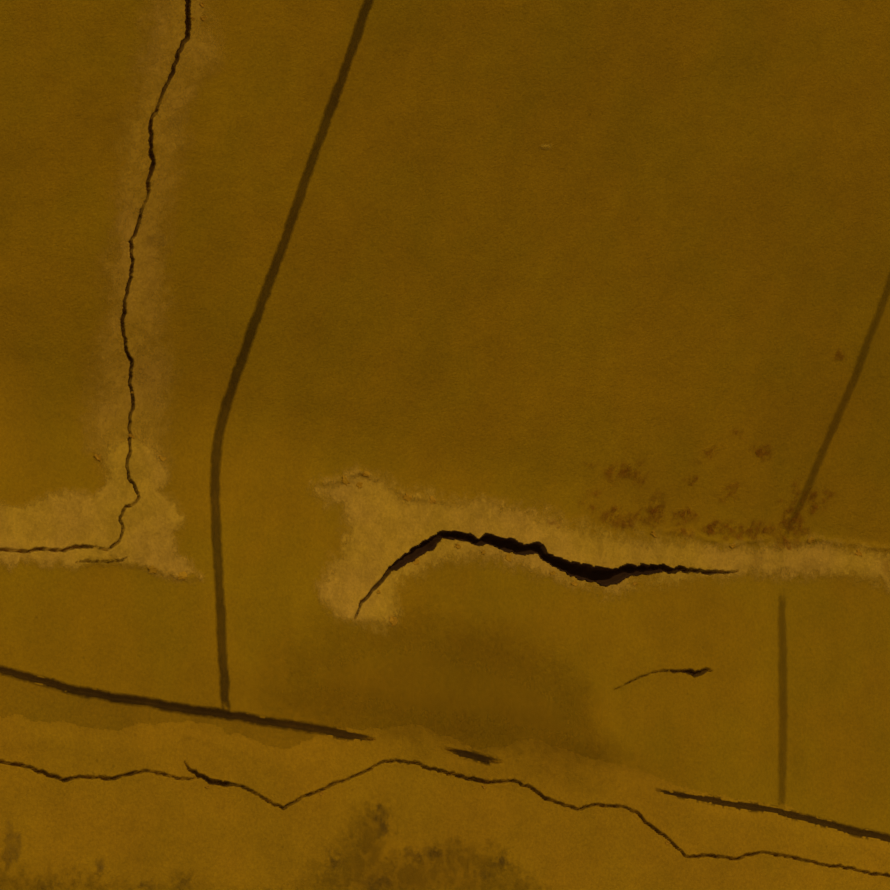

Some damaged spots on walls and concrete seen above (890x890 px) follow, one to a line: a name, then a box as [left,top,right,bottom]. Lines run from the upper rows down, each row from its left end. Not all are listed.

crack [36,0,196,552]
crack [356,530,730,614]
crack [672,669,707,677]
crack [0,761,165,782]
crack [191,770,263,798]
crack [611,805,719,858]